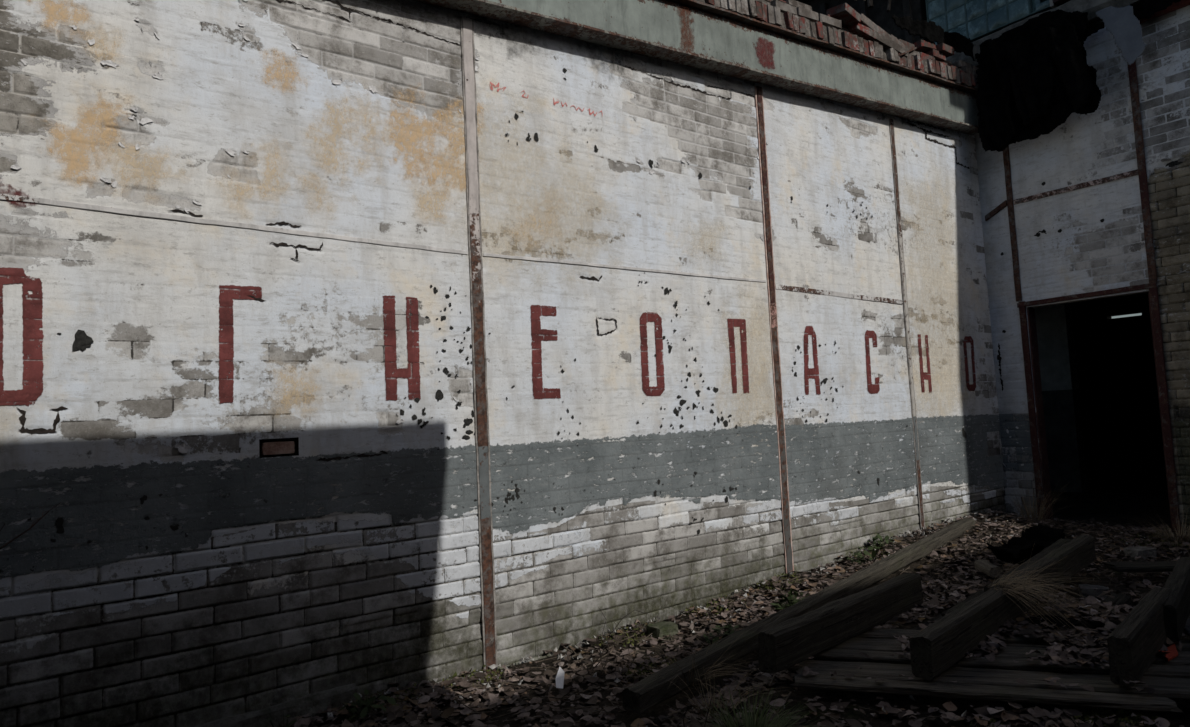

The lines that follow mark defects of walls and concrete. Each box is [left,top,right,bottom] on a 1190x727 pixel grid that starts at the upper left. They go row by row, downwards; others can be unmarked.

peeling [0,0,119,137]
corrosion [755,37,775,69]
peeling [0,152,22,178]
damp [49,101,160,183]
damp [390,92,466,217]
peeling [602,47,777,241]
peeling [0,208,75,271]
peeling [57,330,94,351]